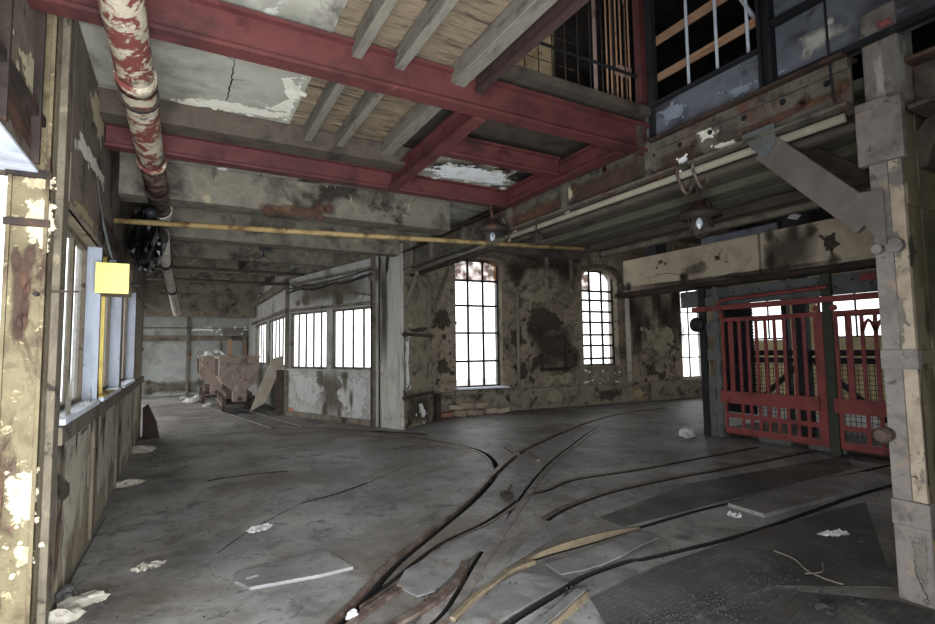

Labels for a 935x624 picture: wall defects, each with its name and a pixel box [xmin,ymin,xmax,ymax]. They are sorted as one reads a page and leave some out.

crack [226,57,235,101]
peeling [170,77,306,121]
peeling [74,81,105,192]
peeling [696,128,737,149]
peeling [423,162,510,190]
leakage [617,283,635,319]
peeling [289,371,324,409]
leakage [318,368,353,416]
peeling [337,372,370,419]
peeling [381,307,457,429]
peeling [4,468,40,529]
peeling [2,541,44,580]